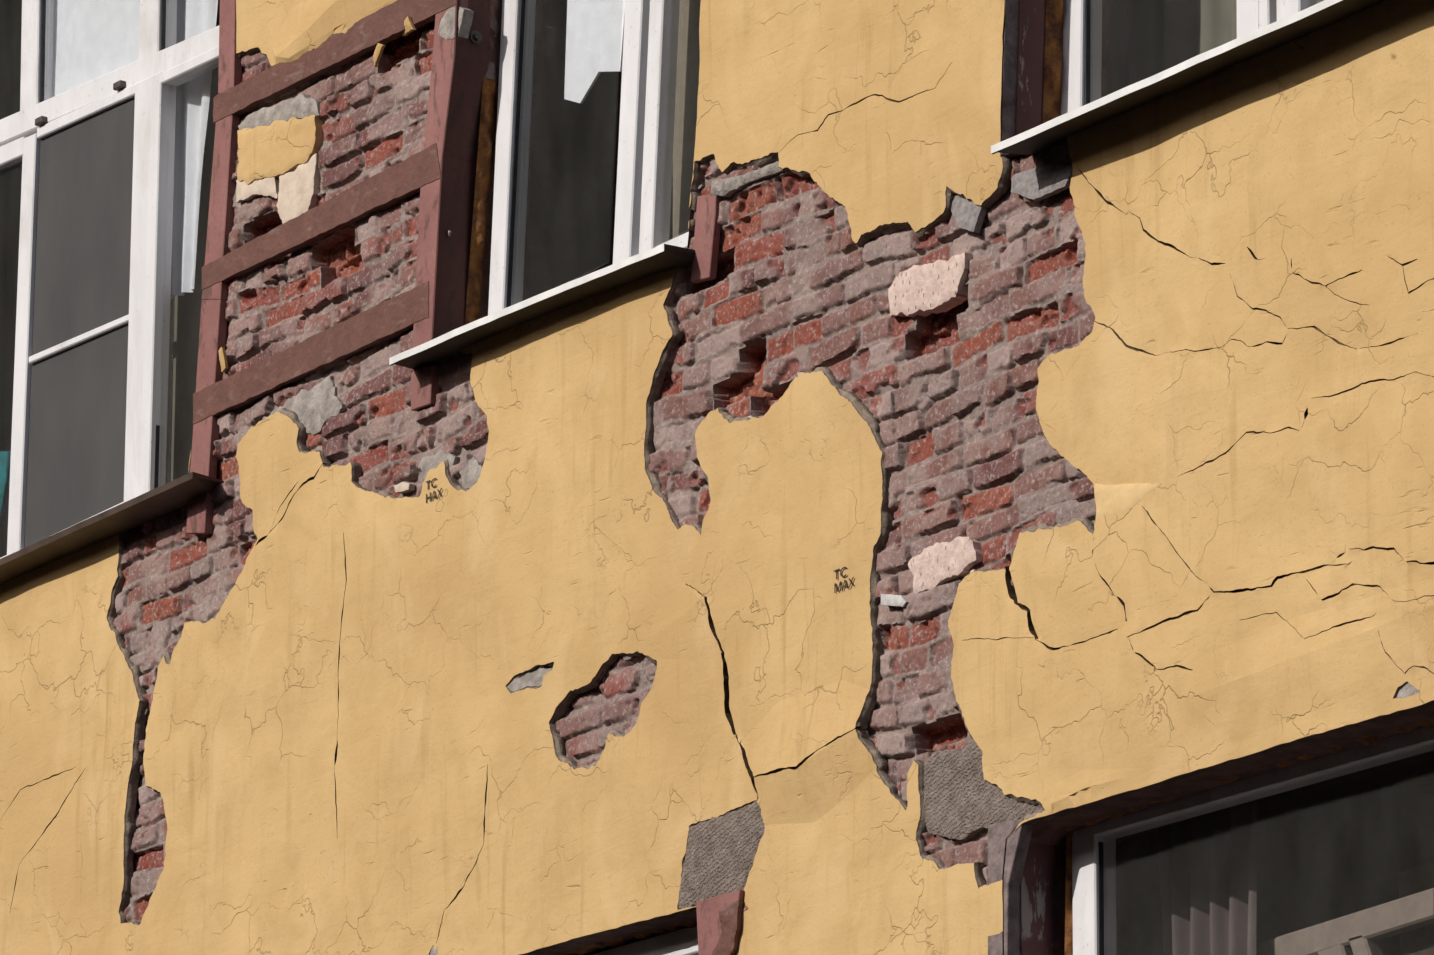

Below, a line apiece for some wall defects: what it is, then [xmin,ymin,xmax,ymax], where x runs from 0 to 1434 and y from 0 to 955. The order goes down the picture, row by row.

flaking render [228,6,474,251]
crack [779,65,950,152]
flaking render [218,193,420,380]
crack [1076,166,1434,476]
flaking render [106,330,489,925]
peeling [506,662,554,693]
flaking render [549,651,657,769]
crack [686,584,862,799]
flaking render [644,139,1161,889]
crack [968,506,1434,674]
flaking render [675,800,765,916]